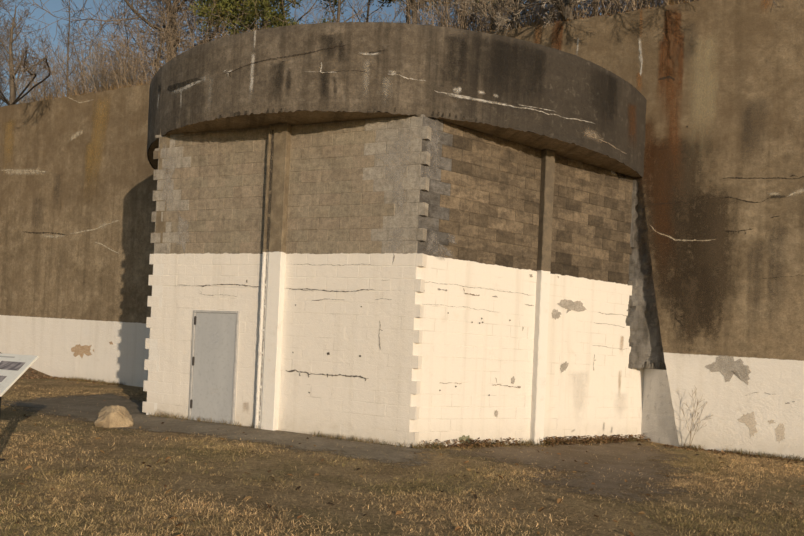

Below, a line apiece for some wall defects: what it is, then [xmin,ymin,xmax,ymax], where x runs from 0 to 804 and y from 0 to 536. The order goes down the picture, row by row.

water stain [434,38,595,124]
crack [718,175,804,218]
crack [25,230,66,238]
water stain [637,140,732,337]
crack [189,280,259,297]
peeling [552,299,586,320]
peeling [71,345,94,358]
crack [286,370,369,381]
peeling [705,356,751,385]
peeling [738,412,757,438]